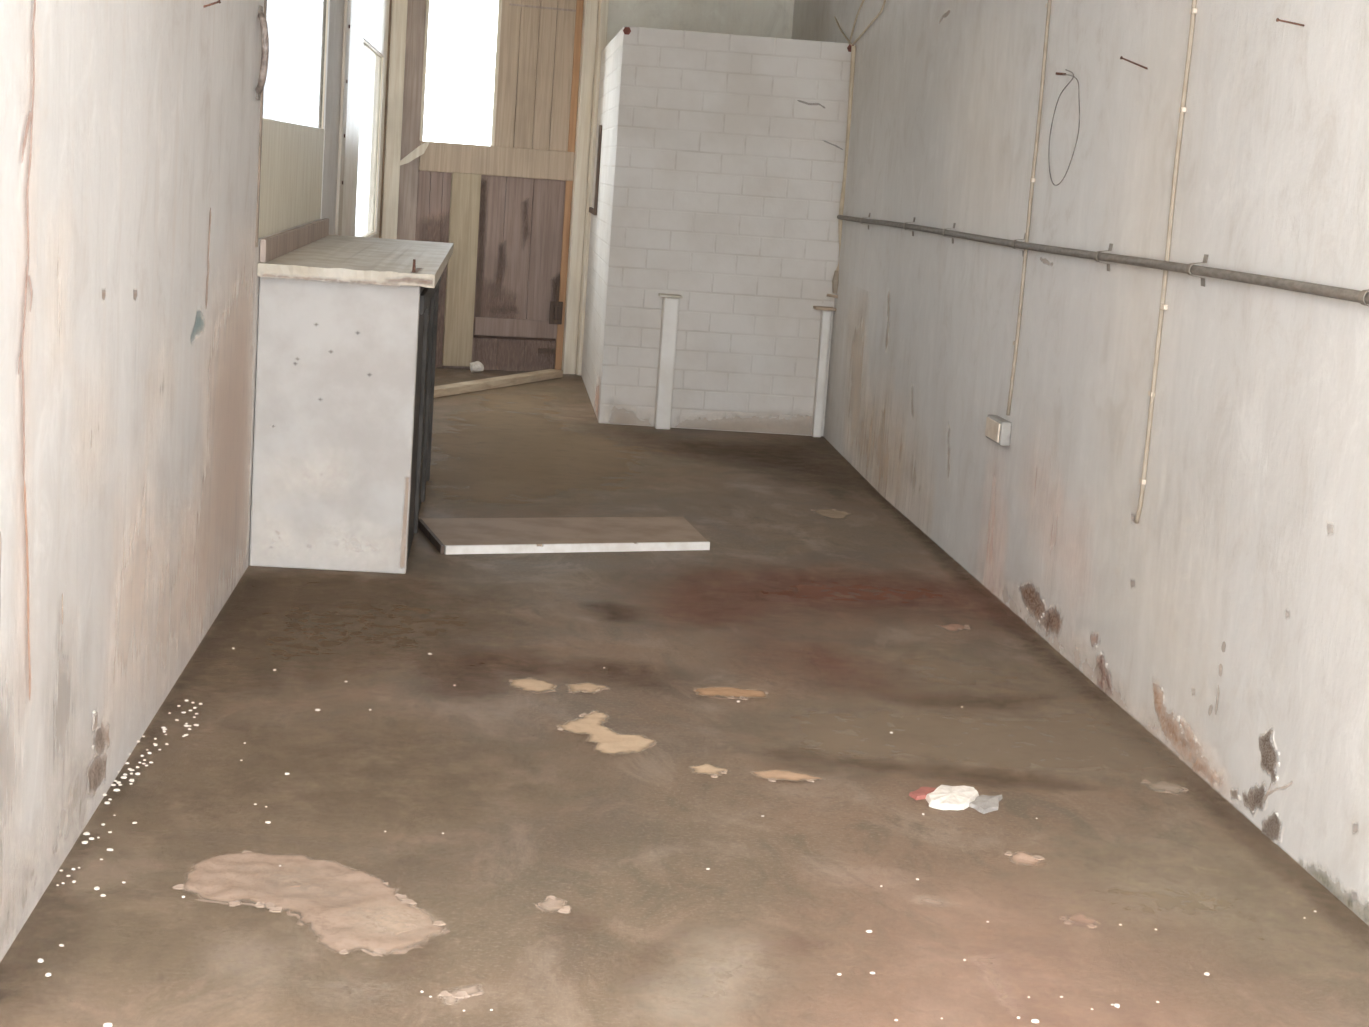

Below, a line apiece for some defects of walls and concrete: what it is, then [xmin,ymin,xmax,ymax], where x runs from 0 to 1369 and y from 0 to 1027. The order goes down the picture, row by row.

flaking render [1017,582,1062,635]
spalling [1141,780,1188,795]
flaking render [1153,685,1291,844]